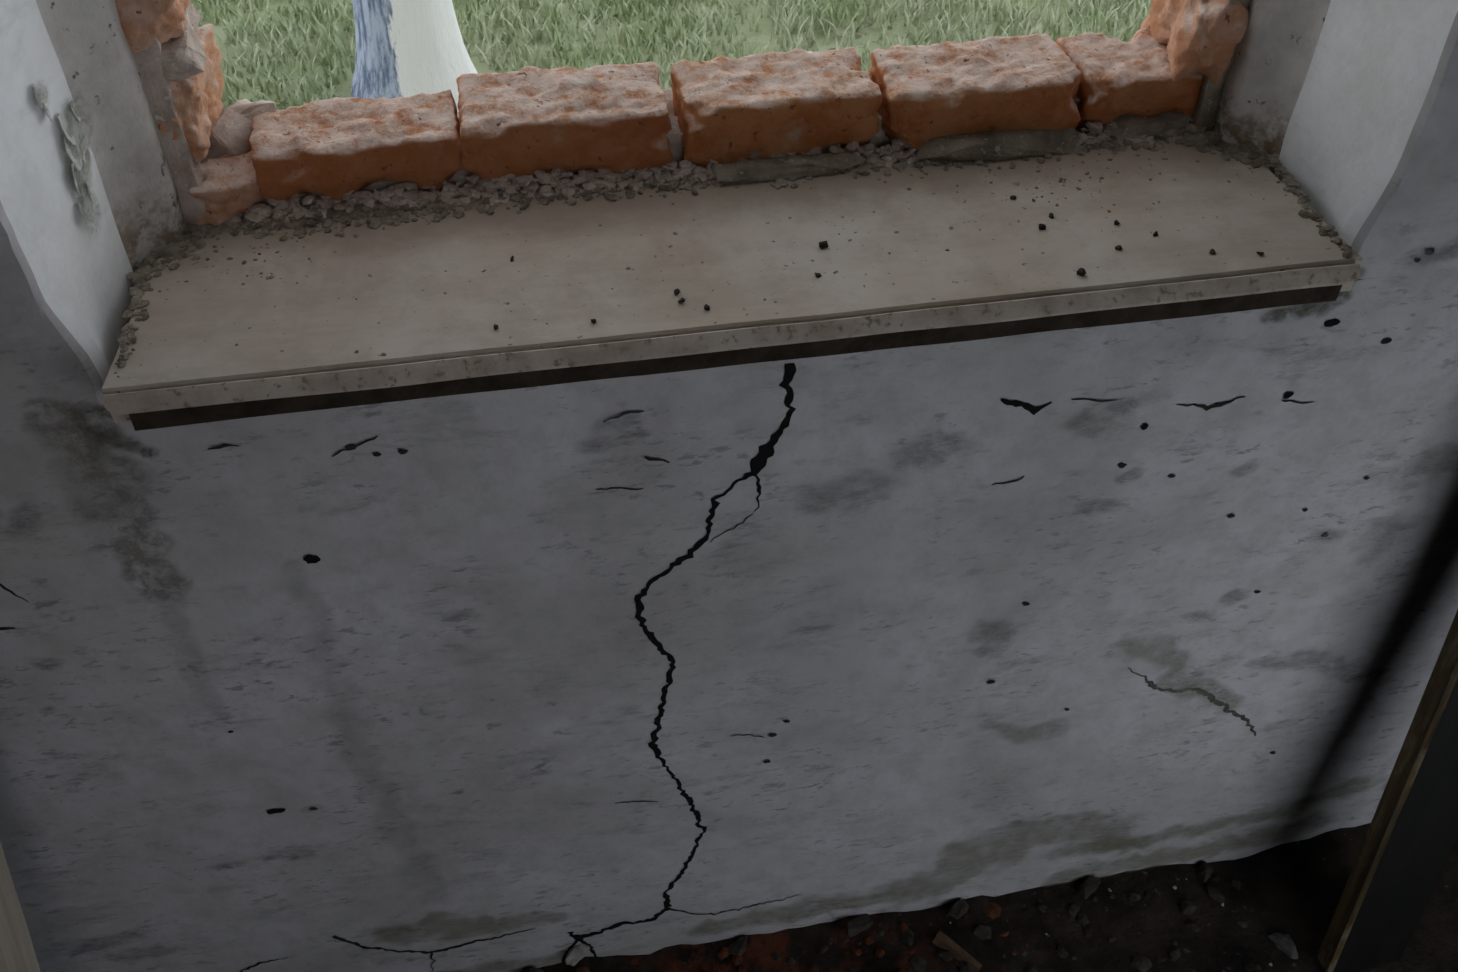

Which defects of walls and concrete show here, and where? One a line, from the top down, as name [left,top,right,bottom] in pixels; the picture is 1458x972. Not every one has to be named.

peeling [32,83,99,232]
water stain [32,401,182,598]
crack [333,363,797,972]
crack [1128,668,1256,736]